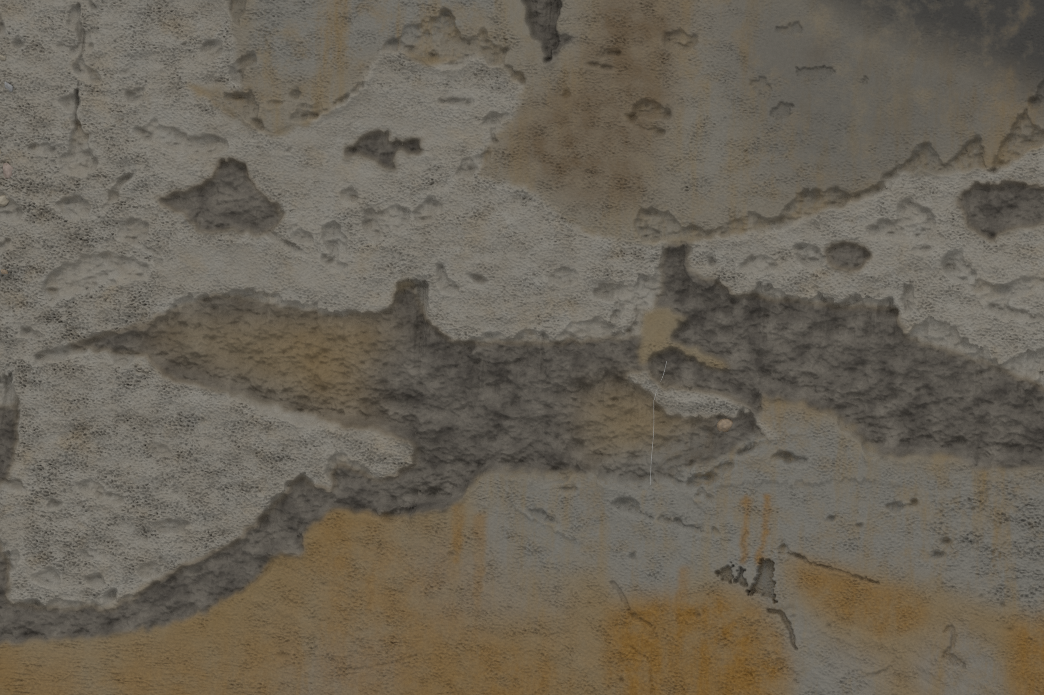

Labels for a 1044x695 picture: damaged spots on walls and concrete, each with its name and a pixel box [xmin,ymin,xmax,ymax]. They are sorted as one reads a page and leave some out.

spalling [0,0,925,612]
spalling [688,145,1044,391]